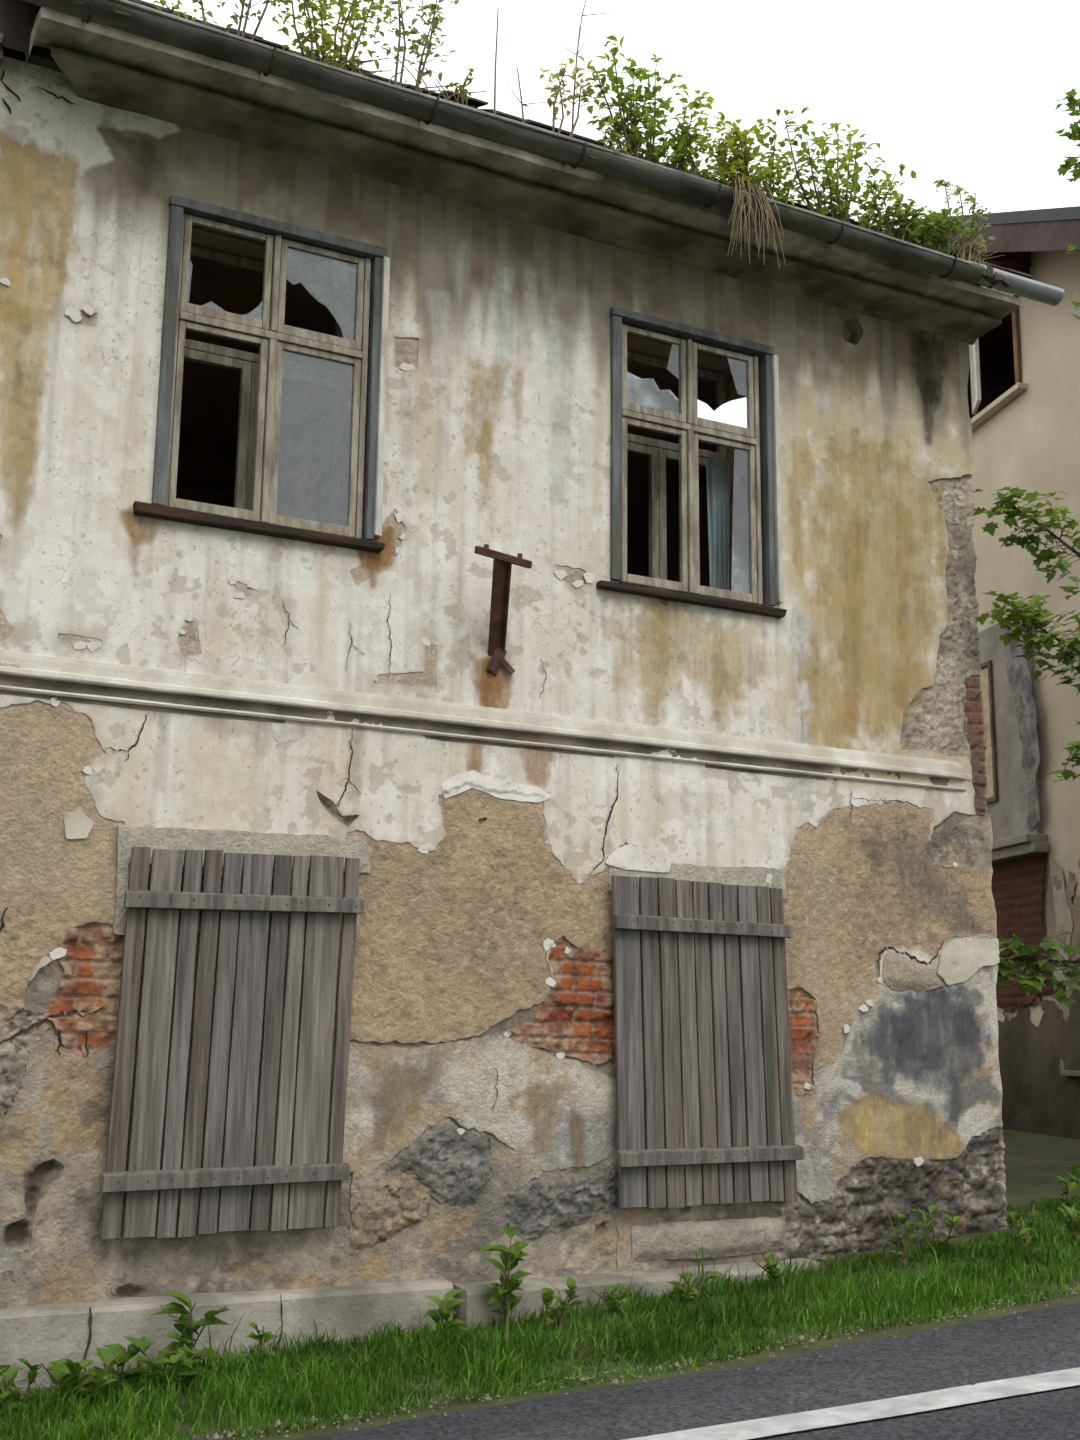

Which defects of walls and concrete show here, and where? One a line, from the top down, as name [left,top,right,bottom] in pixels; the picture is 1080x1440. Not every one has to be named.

leakage [0,137,75,510]
leakage [911,332,944,416]
peeling [0,609,17,642]
rust [469,740,480,770]
rust [475,660,509,709]
leakage [814,443,926,734]
flaking render [783,475,1073,1096]
flaking render [0,698,763,1317]